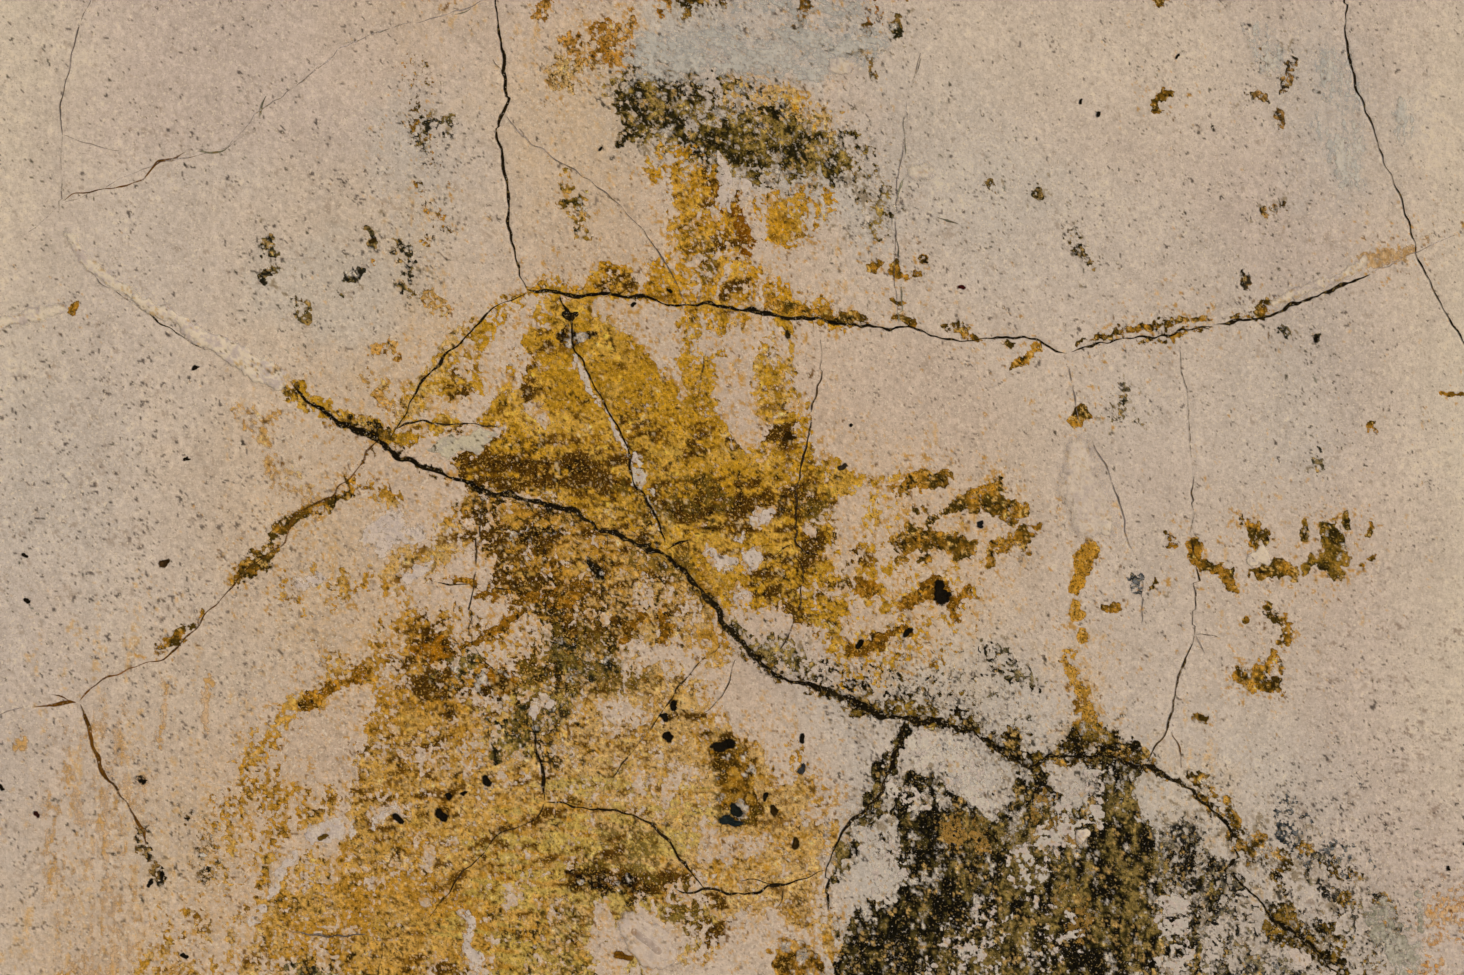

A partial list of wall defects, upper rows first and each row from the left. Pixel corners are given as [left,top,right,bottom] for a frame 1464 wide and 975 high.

crack [60,0,118,151]
crack [92,273,199,347]
crack [29,23,406,232]
crack [422,0,483,22]
leakage [598,0,908,257]
crack [493,0,1063,540]
crack [1072,0,1464,352]
crack [36,694,75,707]
crack [80,295,1342,975]
leakage [729,572,1424,975]